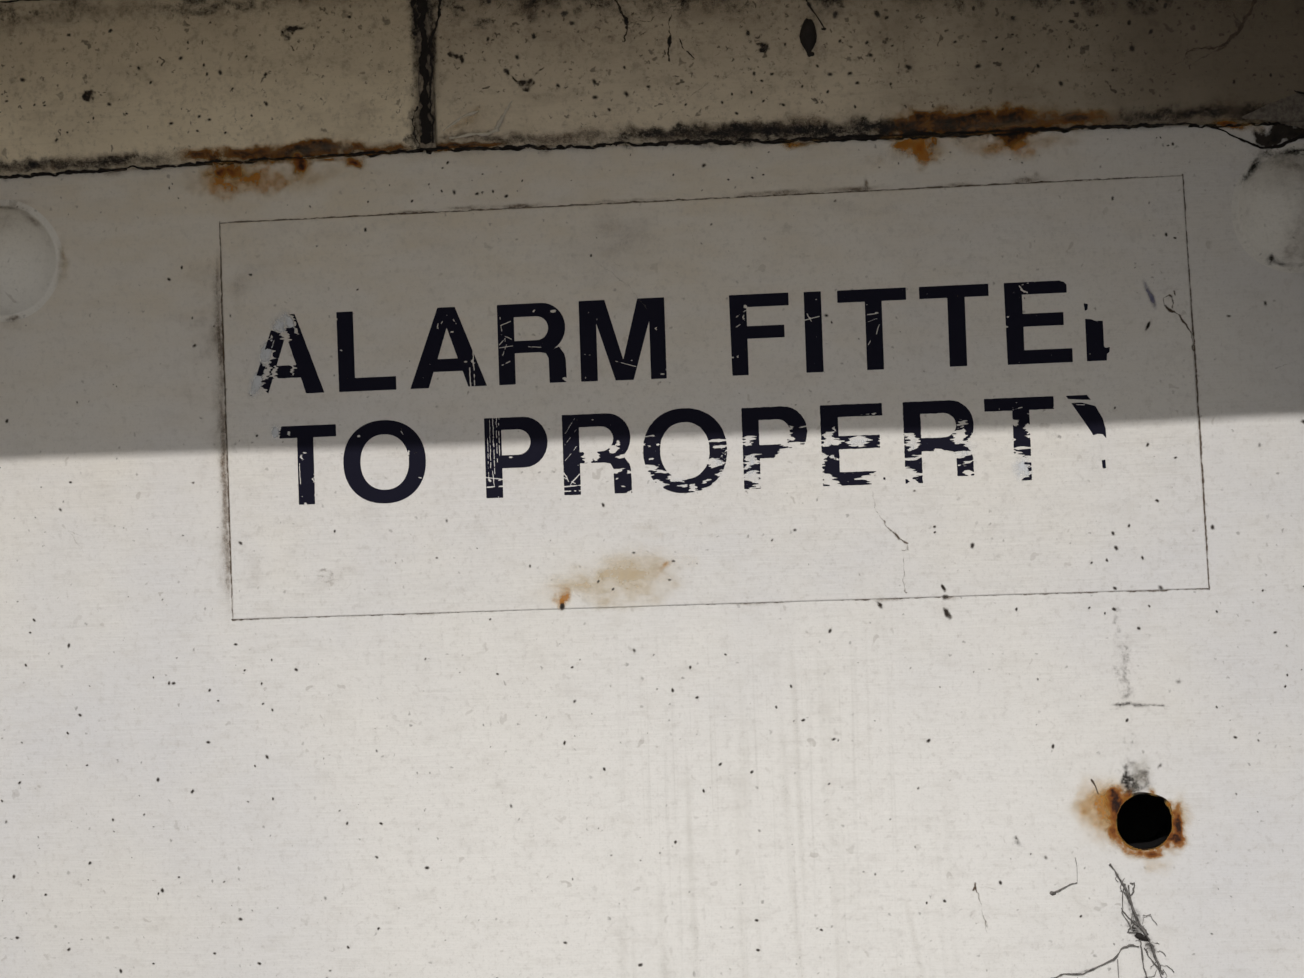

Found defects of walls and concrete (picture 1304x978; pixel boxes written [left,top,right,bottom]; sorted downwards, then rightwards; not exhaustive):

leakage [504,55,543,92]
corrosion [878,102,1109,164]
peeling [1188,90,1304,149]
corrosion [184,138,408,193]
corrosion [1083,779,1186,859]